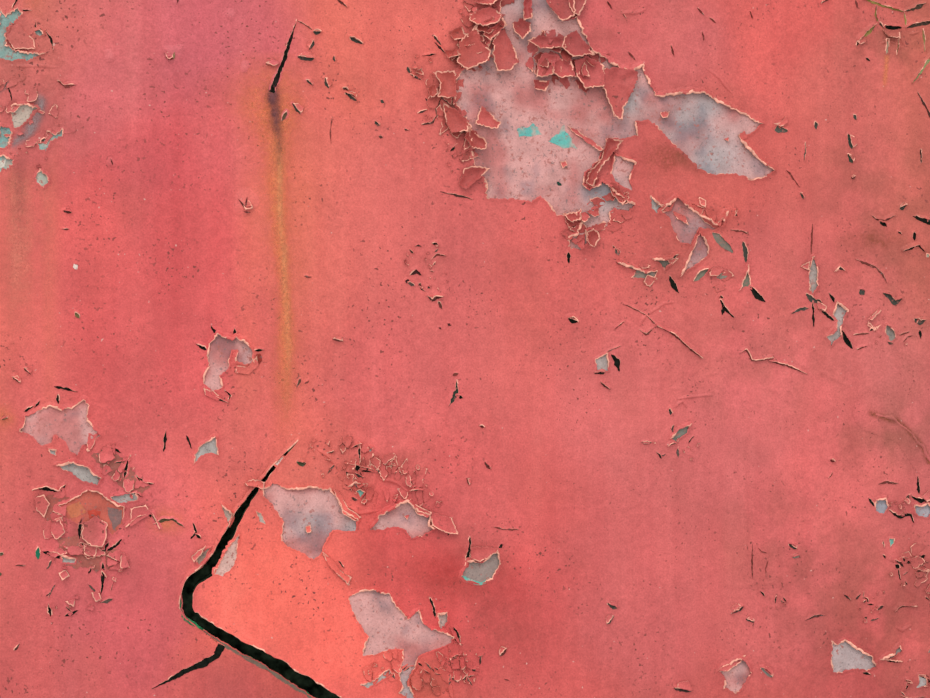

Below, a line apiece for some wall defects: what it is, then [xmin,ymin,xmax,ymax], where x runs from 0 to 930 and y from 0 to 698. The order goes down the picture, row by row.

peeling [0,0,78,191]
corrosion [262,91,291,368]
crack [265,17,313,93]
peeling [403,0,806,310]
peeling [789,223,928,352]
peeling [15,383,164,619]
crack [160,428,170,454]
peeling [192,501,242,578]
crack [148,437,353,698]
peeling [244,433,505,698]
crack [493,524,520,532]
peeling [826,637,904,676]